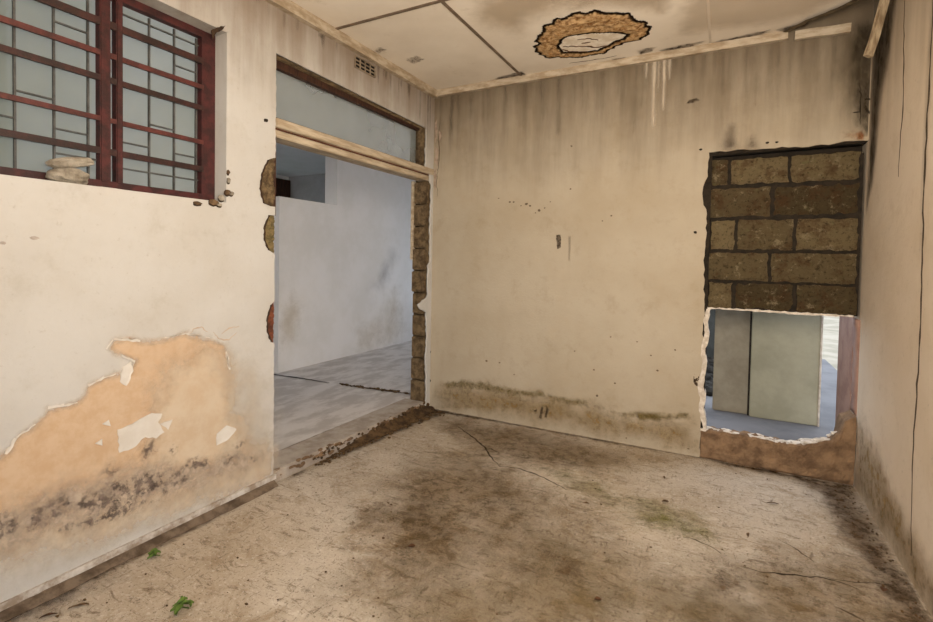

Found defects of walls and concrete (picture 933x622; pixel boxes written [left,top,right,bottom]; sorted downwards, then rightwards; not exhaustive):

water stain [0,442,255,547]
peeling [0,333,359,559]
water stain [444,382,684,444]